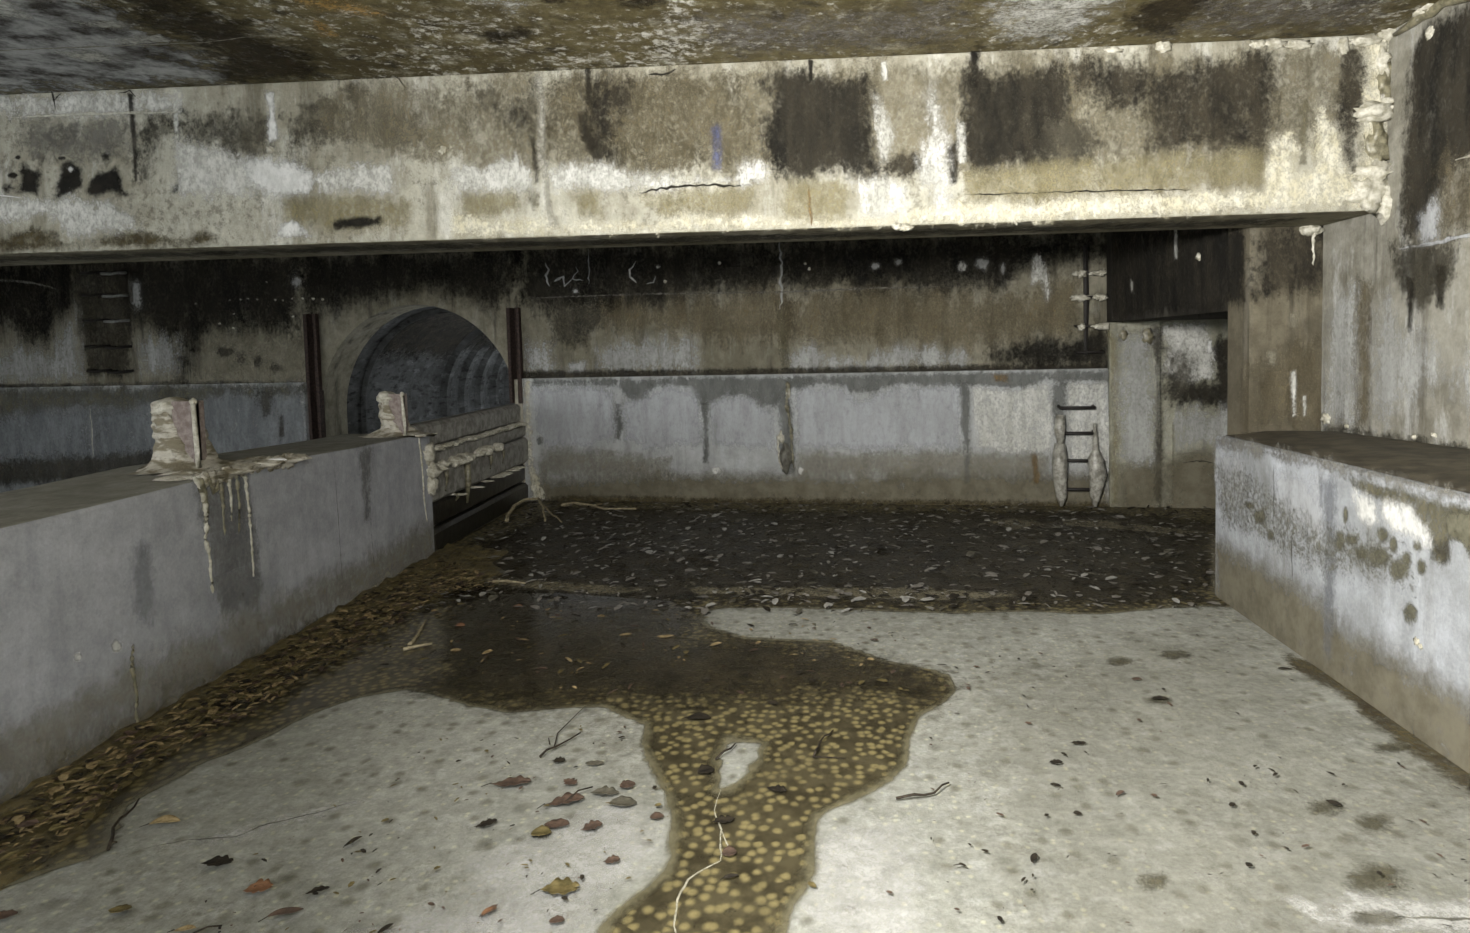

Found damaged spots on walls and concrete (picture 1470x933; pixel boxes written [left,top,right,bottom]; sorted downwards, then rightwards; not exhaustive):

damp [0,530,433,804]
damp [2,687,684,933]
damp [697,444,1470,933]